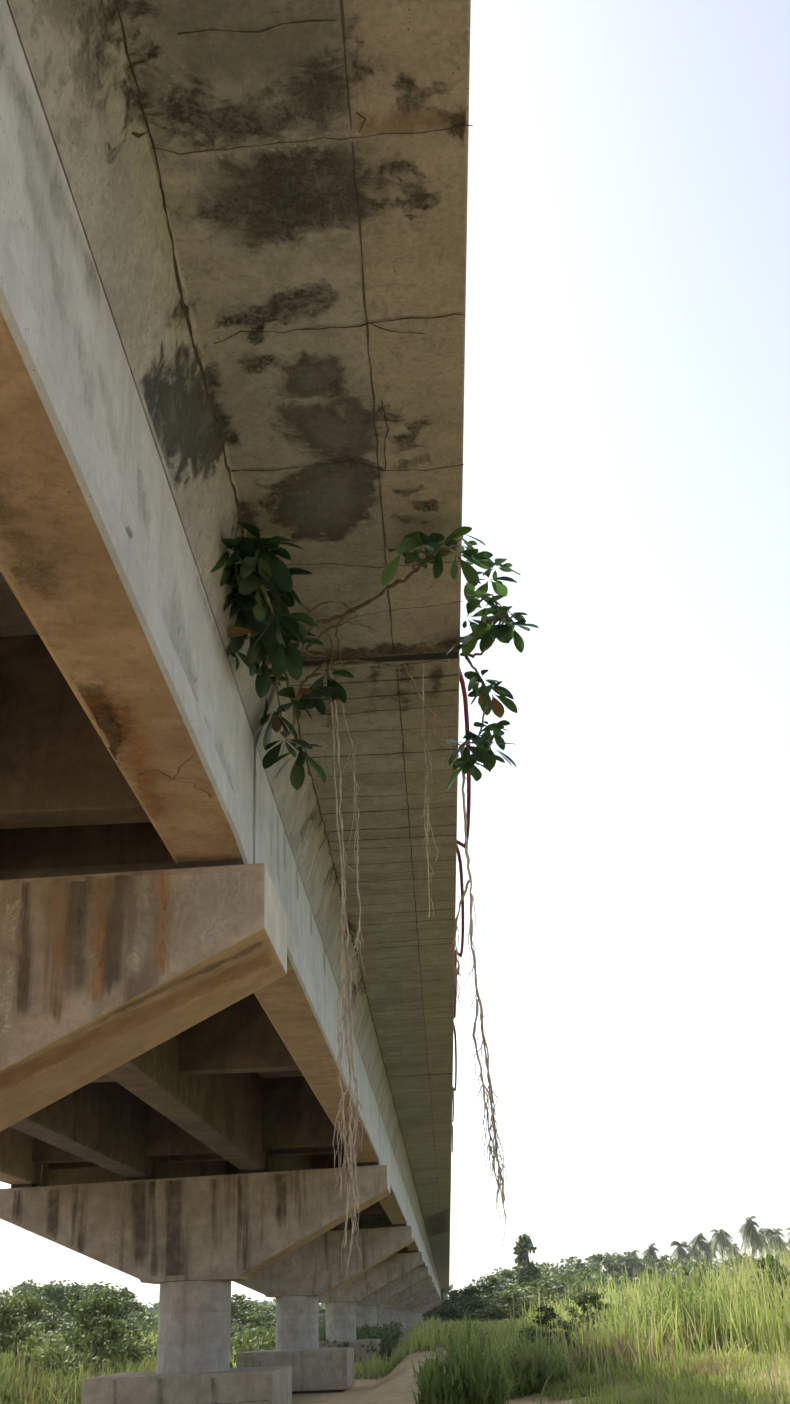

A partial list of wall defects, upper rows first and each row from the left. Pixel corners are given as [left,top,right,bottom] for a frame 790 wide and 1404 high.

water stain [39,0,444,240]
crack [115,0,473,522]
water stain [142,342,239,484]
water stain [217,284,430,542]
rust [79,688,129,747]